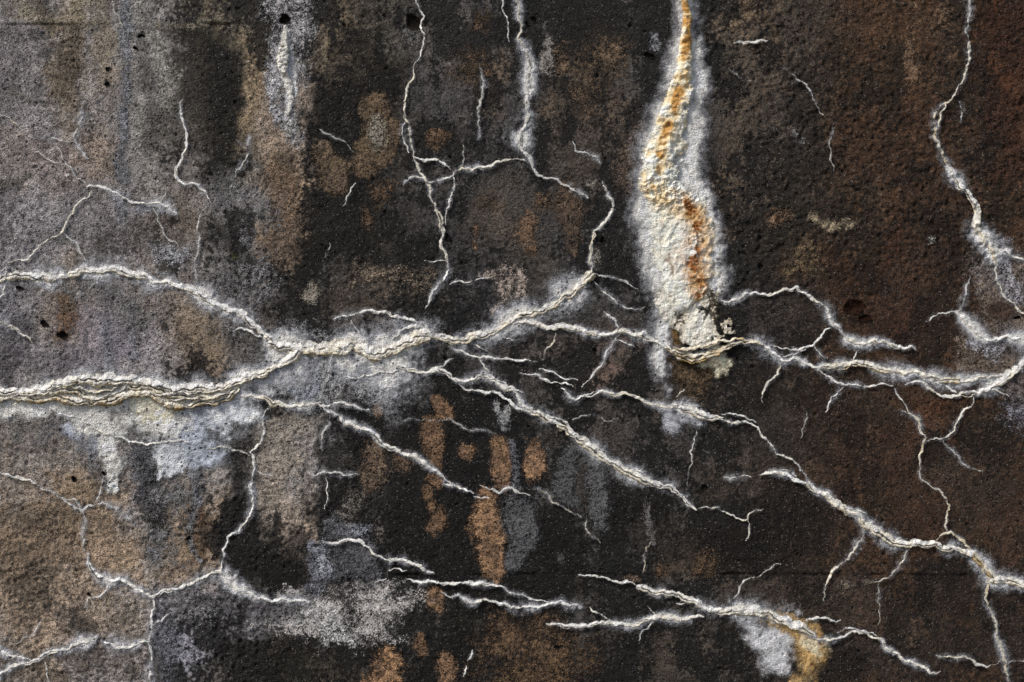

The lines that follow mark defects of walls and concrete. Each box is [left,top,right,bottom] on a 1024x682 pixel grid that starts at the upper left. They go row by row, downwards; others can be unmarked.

crack [49,109,89,159]
crack [174,99,211,262]
crack [235,135,251,177]
crack [319,129,353,152]
crack [401,0,588,309]
damp [609,0,735,433]
crack [735,38,767,46]
crack [792,74,834,172]
crack [933,0,1024,314]
damp [0,243,378,682]
crack [0,146,1024,682]